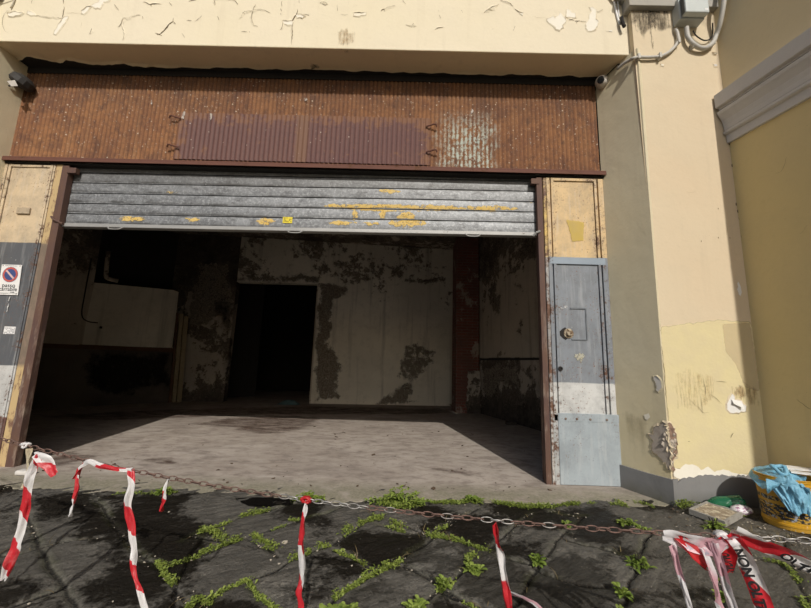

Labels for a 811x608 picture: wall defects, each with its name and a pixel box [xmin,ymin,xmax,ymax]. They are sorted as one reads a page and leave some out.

leakage [633,11,668,32]
peeling [725,393,747,414]
spalling [644,413,747,479]